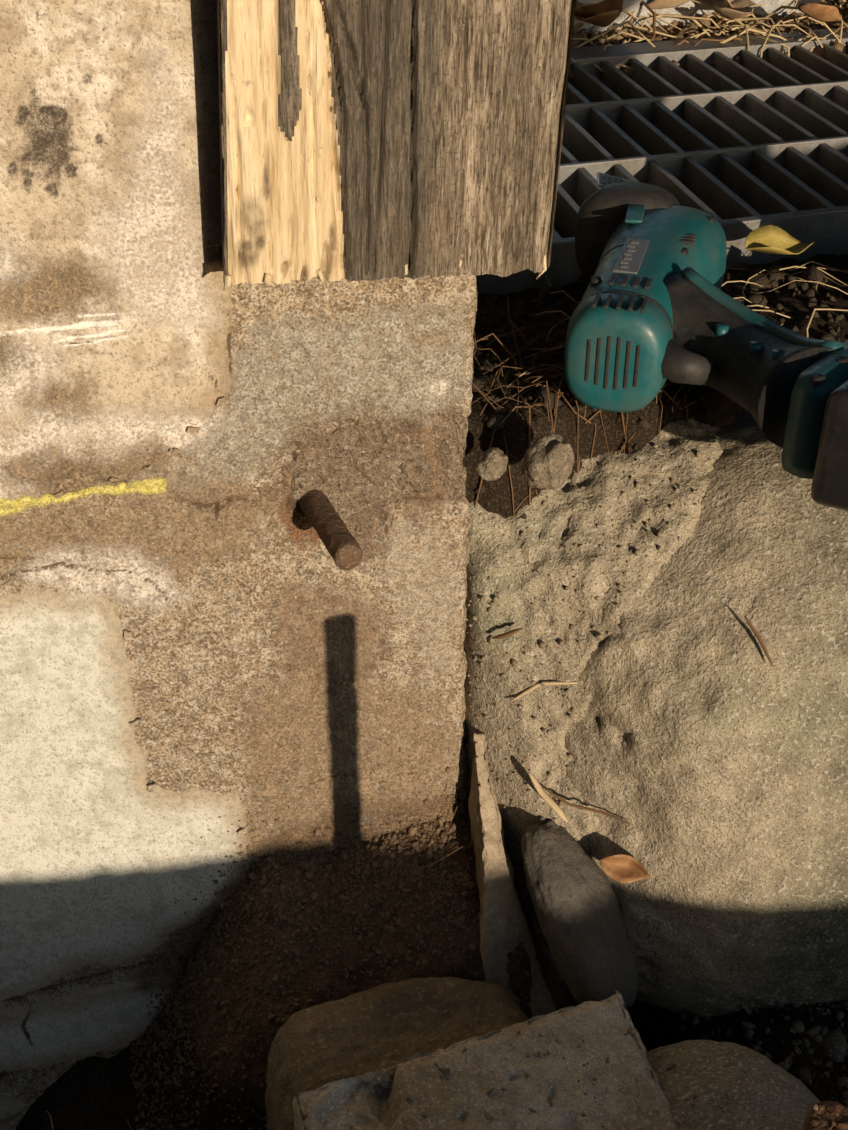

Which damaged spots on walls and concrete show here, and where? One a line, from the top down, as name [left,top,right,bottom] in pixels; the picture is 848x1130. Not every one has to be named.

leakage [0,50,466,502]
corrosion [274,472,320,549]